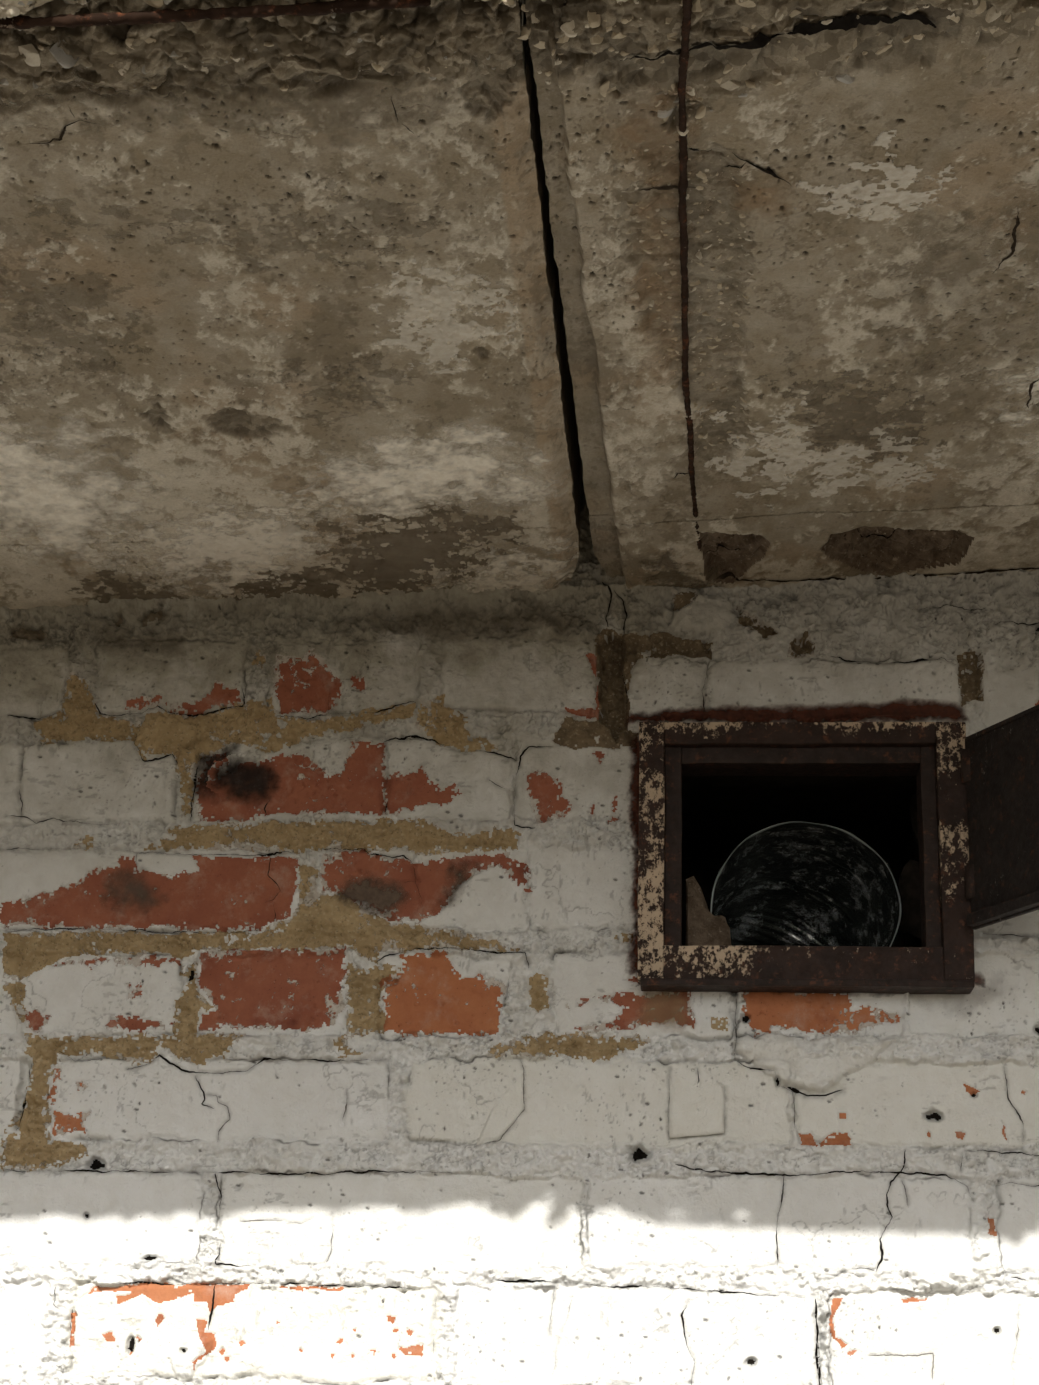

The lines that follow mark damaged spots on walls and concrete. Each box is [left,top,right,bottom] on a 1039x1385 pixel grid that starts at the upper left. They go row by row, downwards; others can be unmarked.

crack [620,13,936,61]
spalling [0,0,1039,471]
crack [993,212,1020,273]
damp [757,369,947,473]
damp [70,540,189,627]
damp [213,504,580,601]
rust [627,699,968,974]
peeling [0,628,901,1172]
crack [6,1052,449,1329]
crack [499,1068,1039,1385]
peeling [88,1282,250,1370]
peeling [331,1316,423,1359]